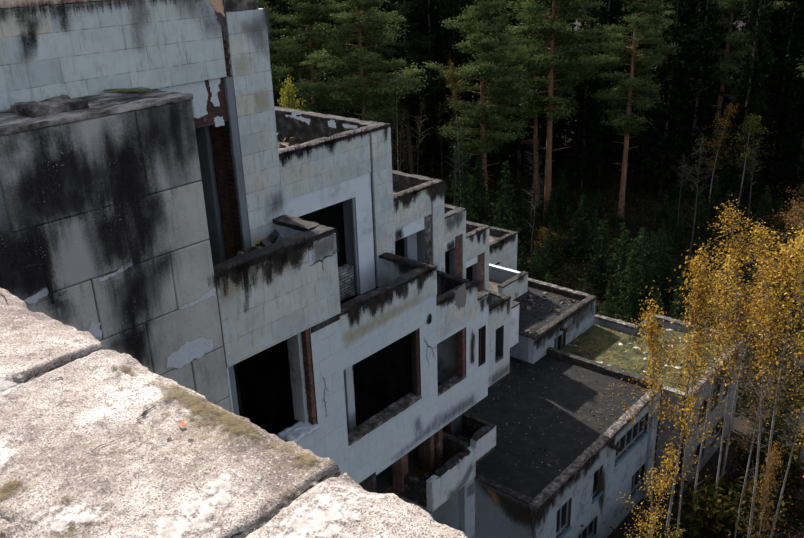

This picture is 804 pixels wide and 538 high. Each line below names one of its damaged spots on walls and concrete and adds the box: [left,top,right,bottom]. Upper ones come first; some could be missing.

leakage [21,14,38,55]
leakage [53,5,67,29]
peeling [157,78,225,127]
leakage [279,120,395,166]
leakage [0,99,195,365]
leakage [470,228,516,254]
peeling [23,288,49,304]
leakage [208,229,335,312]
leakage [344,228,484,326]
leakage [480,293,517,314]
peeling [166,336,214,369]